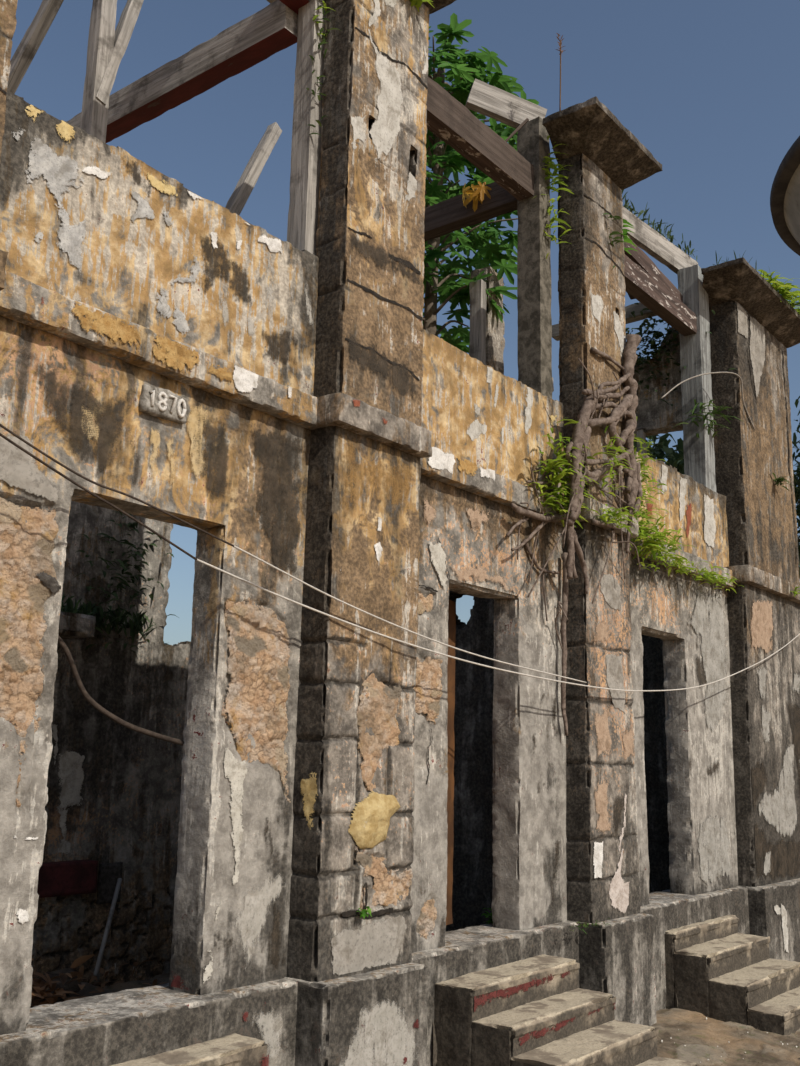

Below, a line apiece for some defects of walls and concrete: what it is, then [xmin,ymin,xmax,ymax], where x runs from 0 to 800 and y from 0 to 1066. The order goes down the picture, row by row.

peeling [13,120,110,272]
peeling [147,173,203,201]
water stain [201,236,252,326]
peeling [258,235,282,254]
water stain [247,261,298,364]
water stain [350,234,420,284]
water stain [37,364,175,485]
water stain [187,406,229,500]
water stain [255,429,303,577]
spalling [0,497,85,855]
spalling [222,597,318,885]
spalling [357,656,443,791]